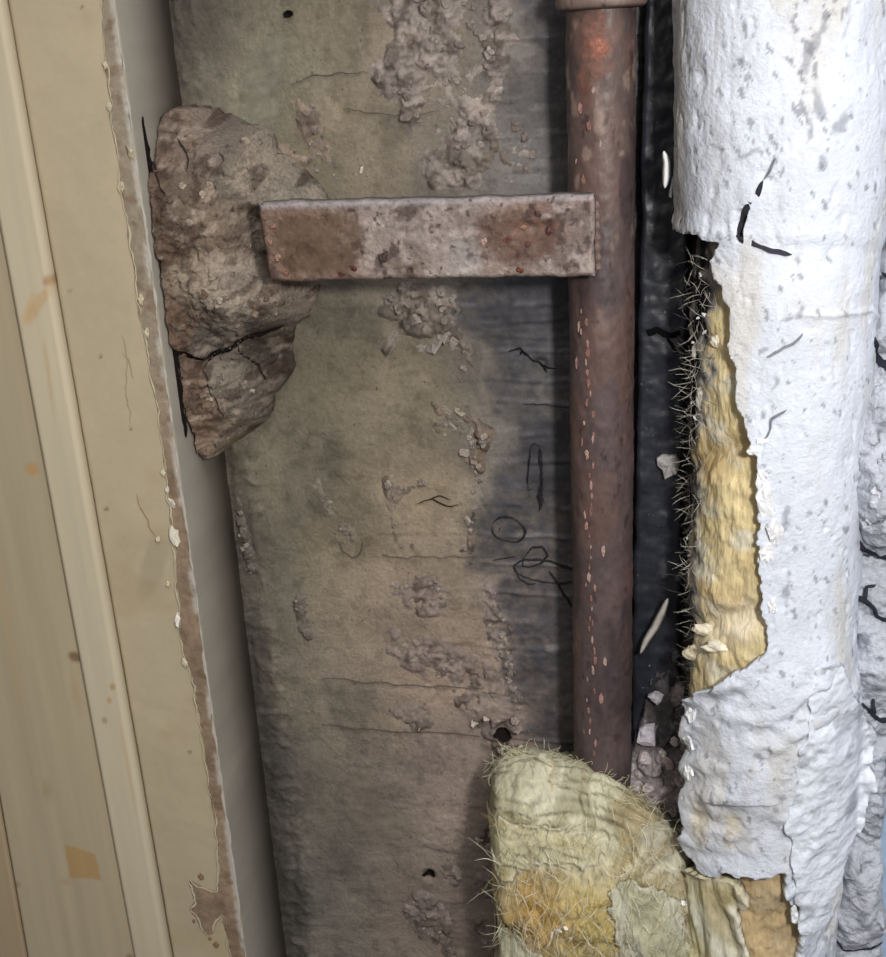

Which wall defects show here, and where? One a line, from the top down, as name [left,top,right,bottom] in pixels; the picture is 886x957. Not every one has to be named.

water stain [530,0,566,81]
spalling [369,0,536,196]
corrosion [479,211,558,273]
crack [736,158,792,256]
spalling [377,281,473,383]
peeling [746,438,769,455]
water stain [456,276,574,752]
peeling [755,470,784,564]
peeling [685,706,696,724]
peeling [790,904,799,924]